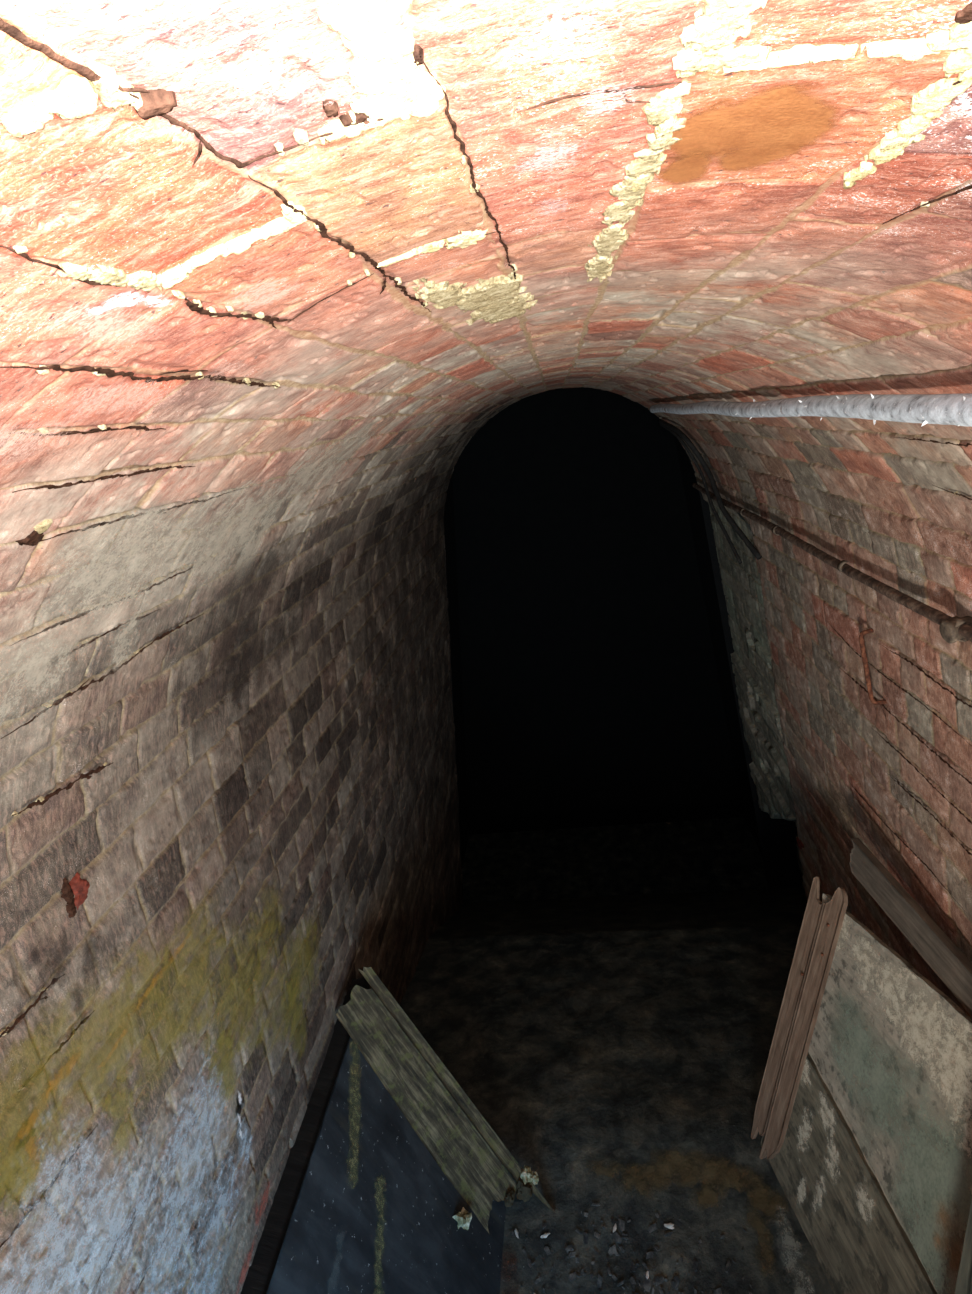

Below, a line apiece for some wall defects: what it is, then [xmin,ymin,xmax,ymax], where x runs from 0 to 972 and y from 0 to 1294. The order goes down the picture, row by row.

spalling [0,61,177,143]
crack [0,17,431,329]
spalling [317,0,446,145]
crack [421,48,520,289]
water stain [660,85,836,183]
spalling [584,0,972,283]
spalling [58,201,307,292]
spalling [377,229,488,268]
crack [0,365,281,389]
crack [8,424,166,436]
crack [12,465,196,493]
water stain [236,1243,254,1294]